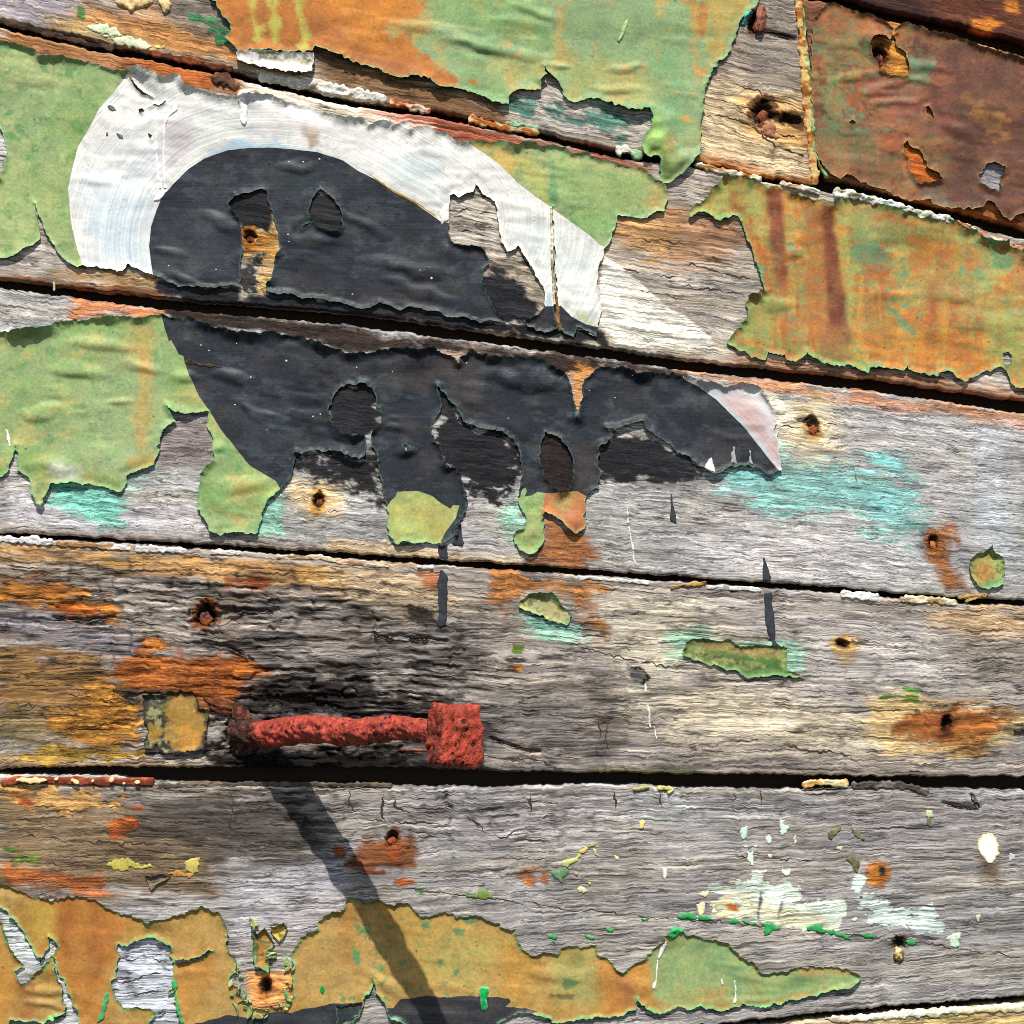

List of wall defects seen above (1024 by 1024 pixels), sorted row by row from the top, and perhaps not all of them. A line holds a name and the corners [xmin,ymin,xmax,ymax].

peeling [0,0,759,337]
peeling [689,2,1024,388]
peeling [0,314,782,554]
rust [923,524,962,588]
peeling [969,545,1006,589]
rust [891,702,1017,754]
rust [335,835,419,887]
rust [866,862,891,887]
peeling [0,885,861,1024]